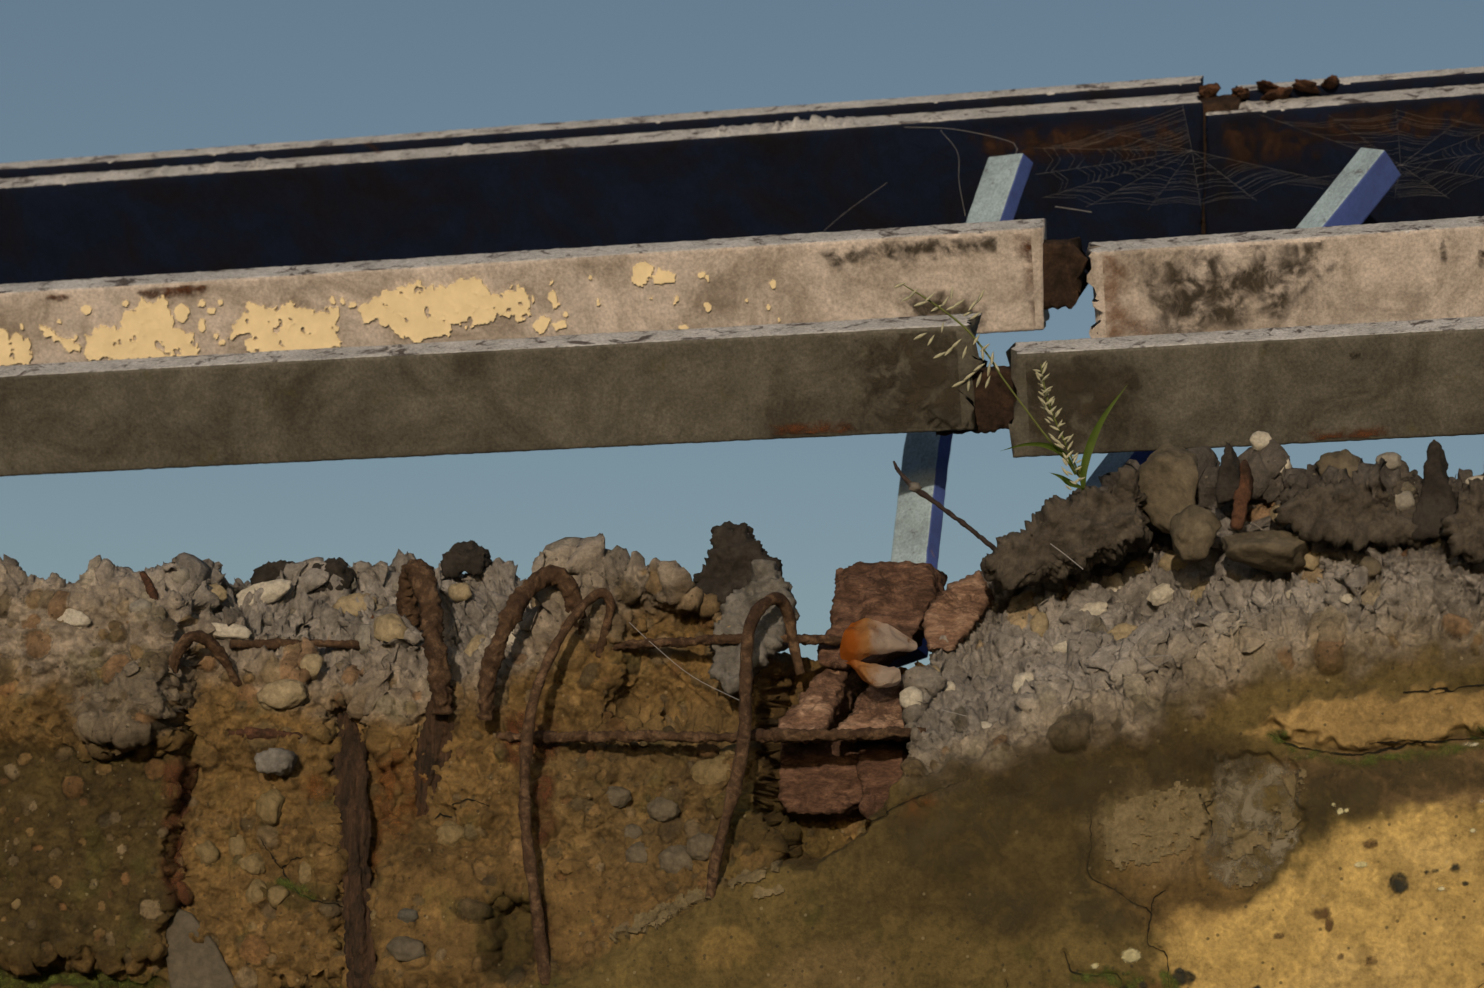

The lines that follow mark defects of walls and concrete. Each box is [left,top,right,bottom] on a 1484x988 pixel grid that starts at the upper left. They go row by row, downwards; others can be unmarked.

peeling [0,277,569,366]
peeling [139,571,159,600]
spalling [168,630,360,687]
spalling [395,559,453,715]
crack [1403,684,1484,694]
spalling [228,727,303,740]
corrosion [413,685,458,817]
spalling [476,564,926,985]
crack [1271,727,1484,756]
crack [1199,793,1277,846]
crack [1086,813,1170,988]
crack [1063,951,1122,986]